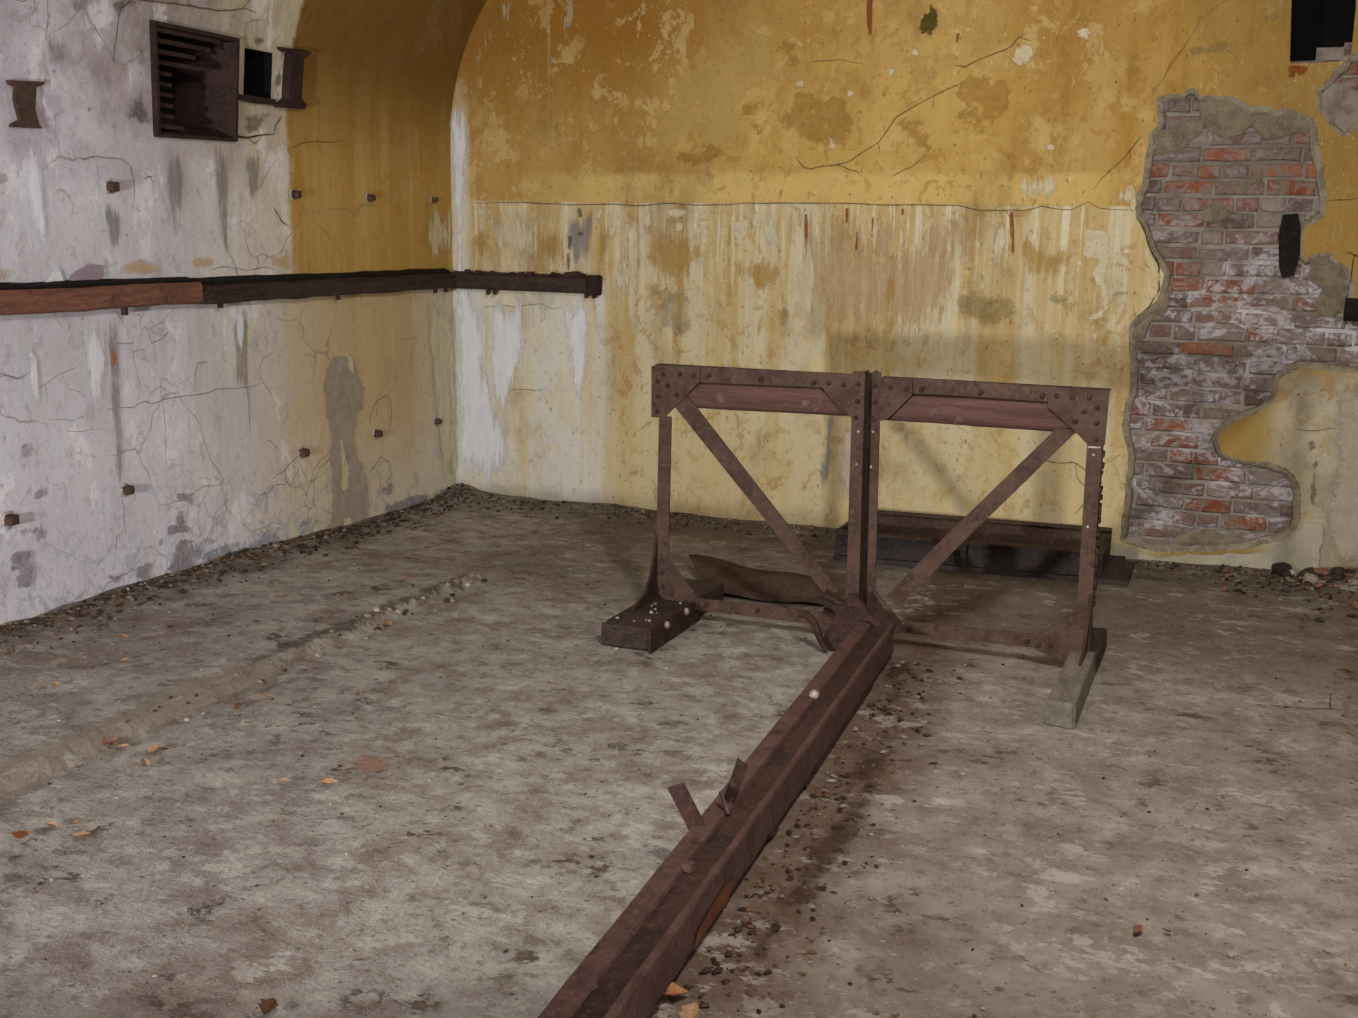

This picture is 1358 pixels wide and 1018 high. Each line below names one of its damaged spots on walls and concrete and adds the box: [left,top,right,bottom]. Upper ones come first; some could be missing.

crack [113,0,256,64]
leakage [667,209,686,218]
crack [495,32,1160,319]
leakage [617,224,699,331]
leakage [805,220,956,333]
spalling [1113,42,1358,572]
crack [0,331,273,452]
crack [253,440,299,512]
crack [369,377,397,488]